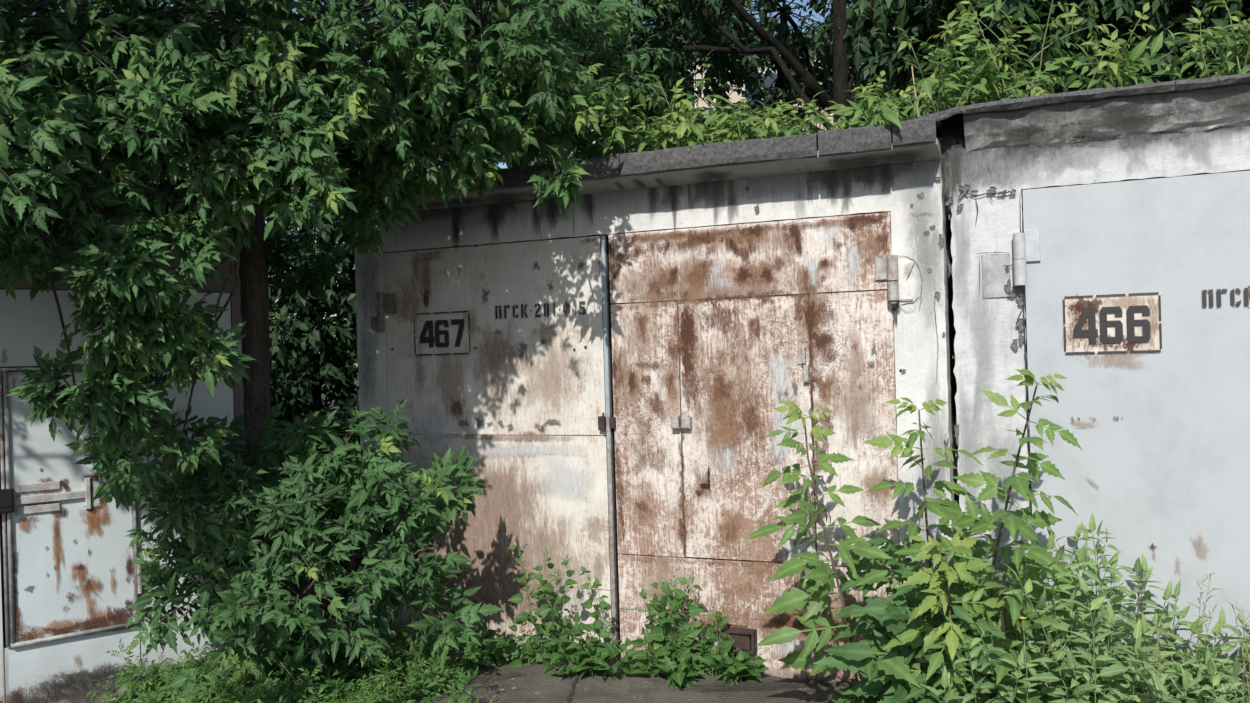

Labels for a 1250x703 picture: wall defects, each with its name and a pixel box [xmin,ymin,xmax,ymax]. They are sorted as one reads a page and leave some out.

leakage [488,193,563,237]
leakage [617,180,736,228]
corrosion [416,311,568,418]
corrosion [447,419,565,440]
corrosion [580,214,890,601]
corrosion [7,473,145,641]
corrosion [426,469,601,614]
corrosion [699,565,861,646]
crack [546,671,580,703]